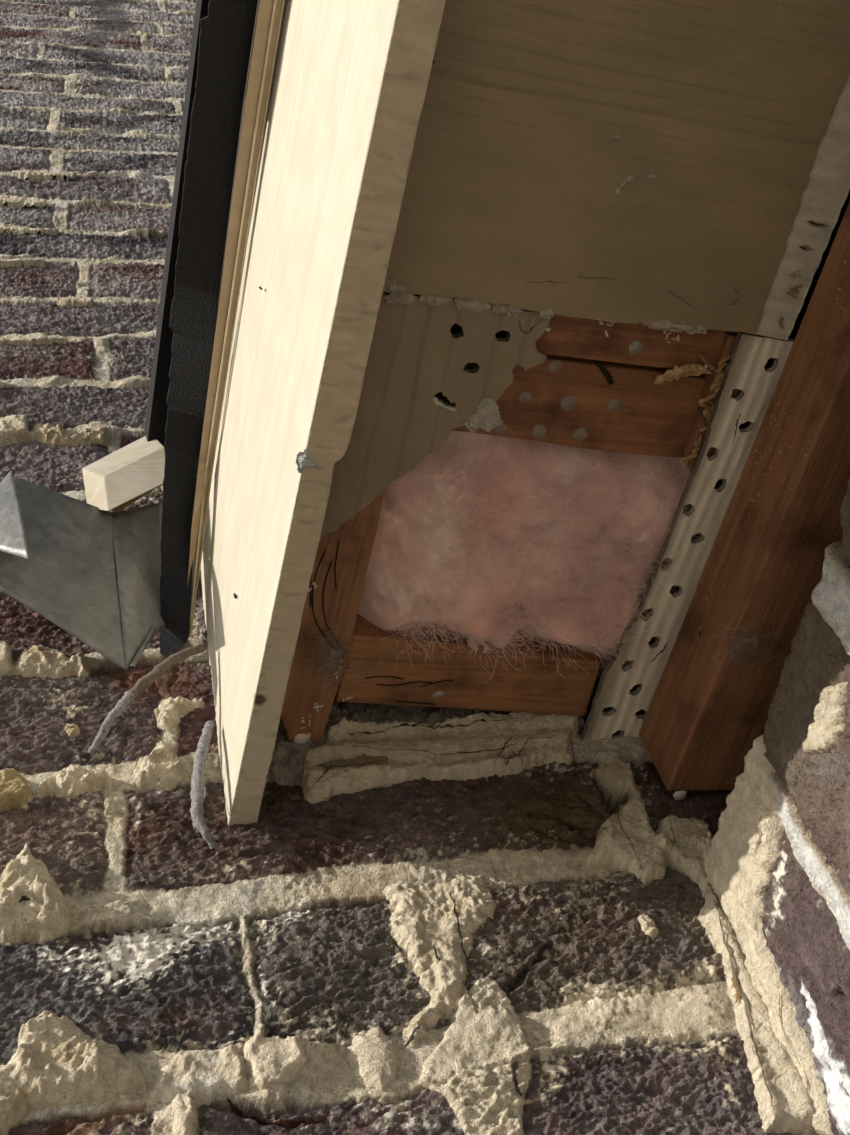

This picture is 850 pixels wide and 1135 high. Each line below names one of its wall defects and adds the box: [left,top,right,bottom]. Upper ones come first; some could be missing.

peeling [382,280,521,317]
peeling [647,319,707,334]
peeling [433,397,503,433]
peeling [296,449,321,473]
leakage [23,899,313,999]
crack [450,891,473,979]